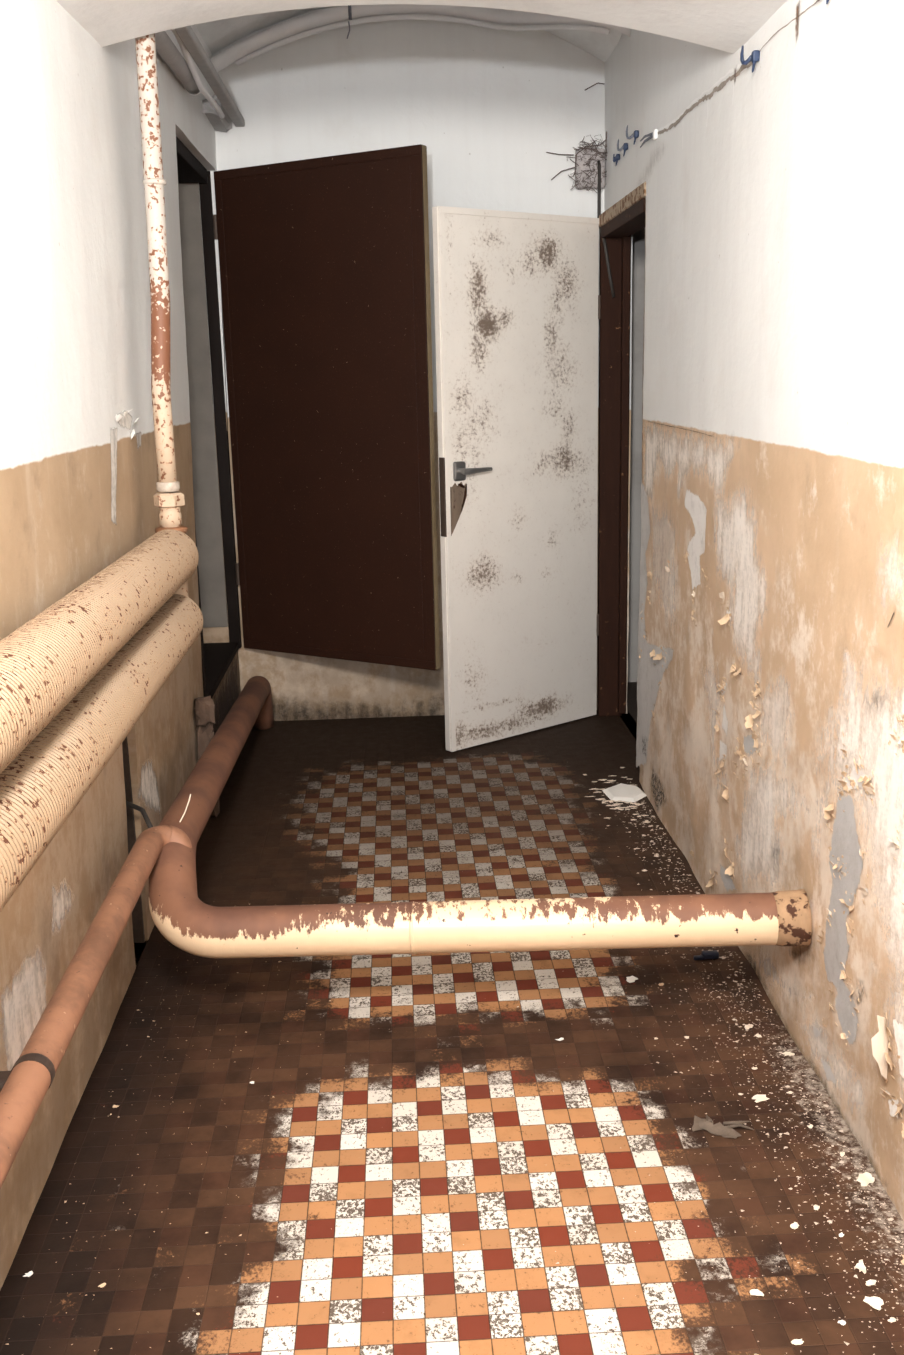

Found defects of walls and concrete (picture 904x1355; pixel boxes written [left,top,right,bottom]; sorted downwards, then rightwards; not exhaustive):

peeling [636,481,732,768]
peeling [711,654,763,803]
peeling [888,700,904,755]
peeling [705,839,735,892]
peeling [817,730,904,1138]
peeling [856,1172,875,1186]